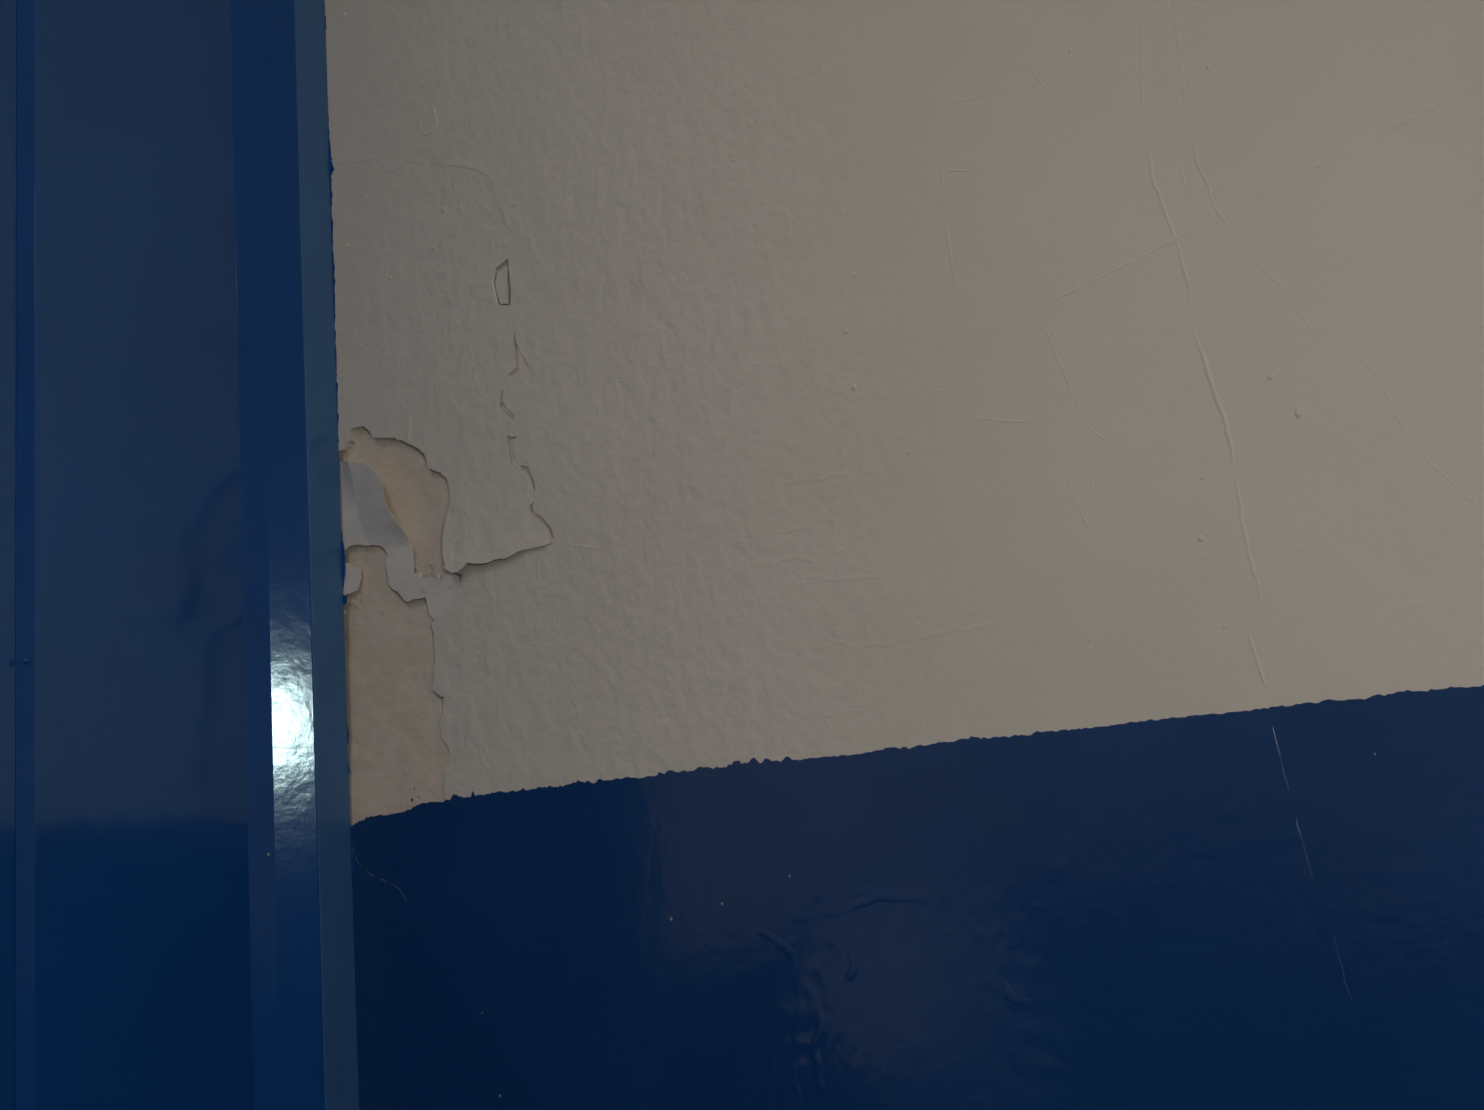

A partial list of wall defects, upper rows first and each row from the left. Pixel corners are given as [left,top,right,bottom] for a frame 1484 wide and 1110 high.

peeling [339,410,552,826]